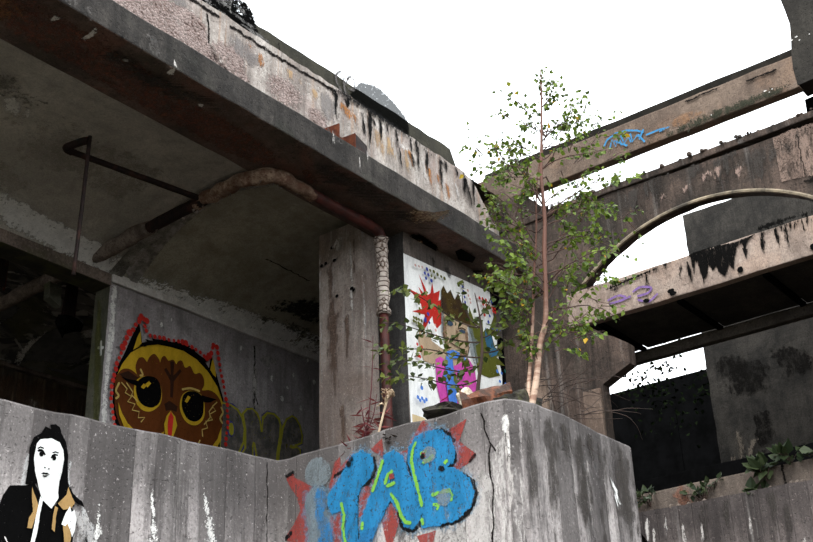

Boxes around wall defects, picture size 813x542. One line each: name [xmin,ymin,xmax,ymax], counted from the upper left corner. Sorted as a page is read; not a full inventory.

leakage [321,89,476,205]
leakage [262,237,355,395]
crack [480,413,496,542]